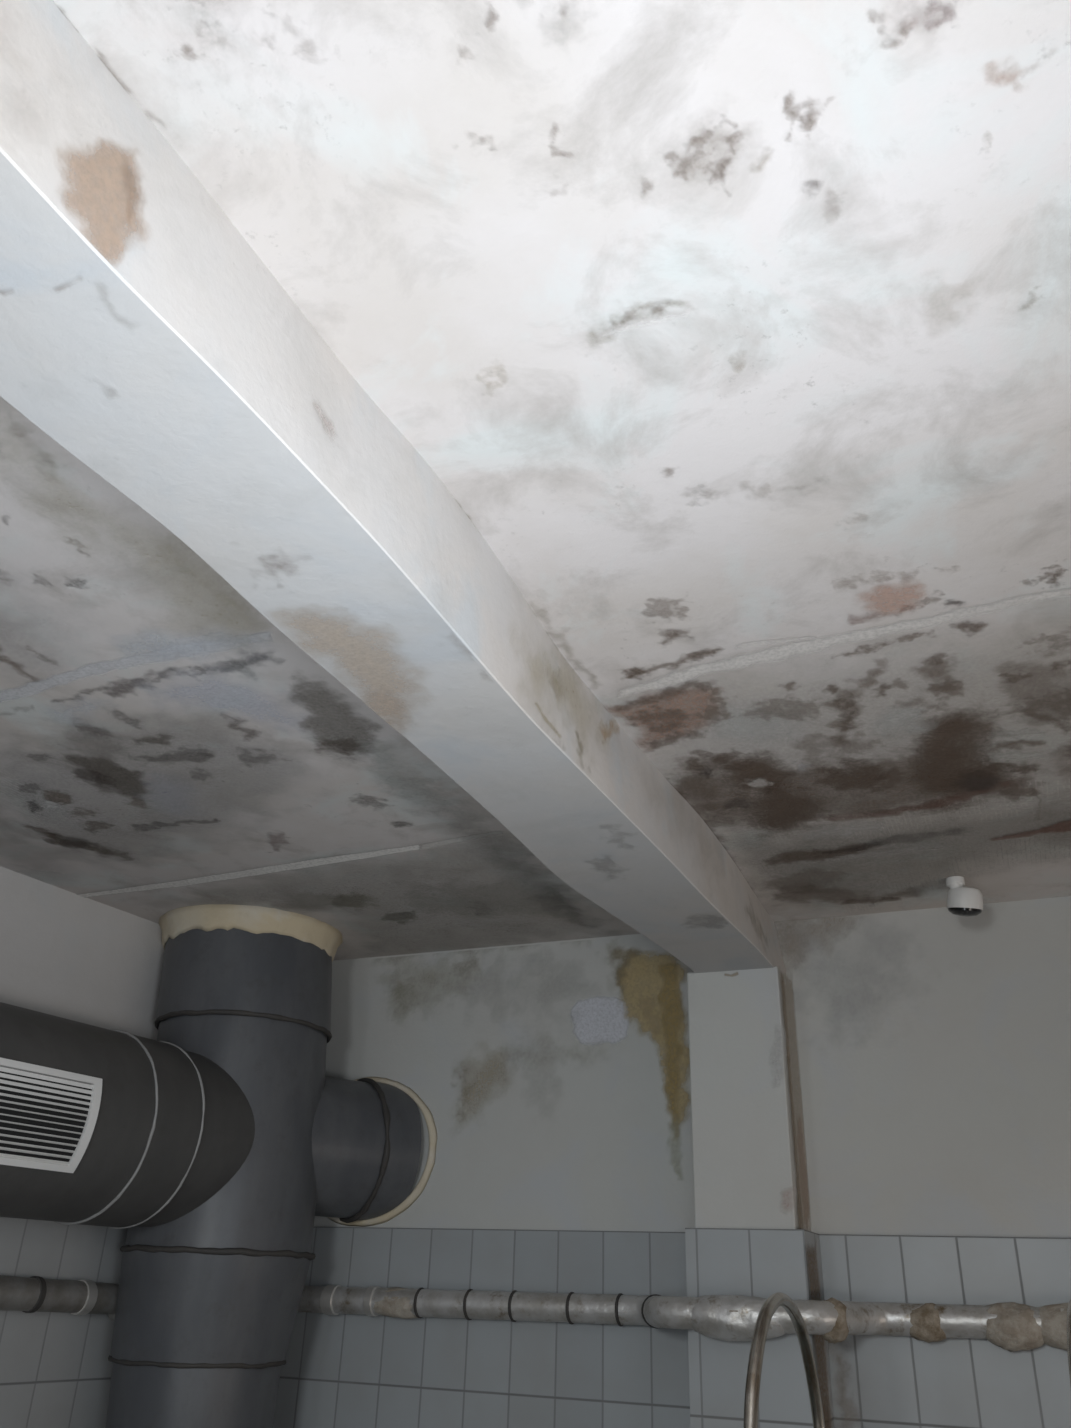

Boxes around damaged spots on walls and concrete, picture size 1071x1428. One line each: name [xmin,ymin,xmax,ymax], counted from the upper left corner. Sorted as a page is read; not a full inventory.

peeling [67,144,139,259]
damp [110,679,144,695]
damp [297,687,373,752]
damp [69,757,145,805]
damp [678,714,1058,863]
damp [47,833,121,855]
damp [616,950,690,1127]
rust [807,1249,821,1301]
rust [814,1334,832,1428]